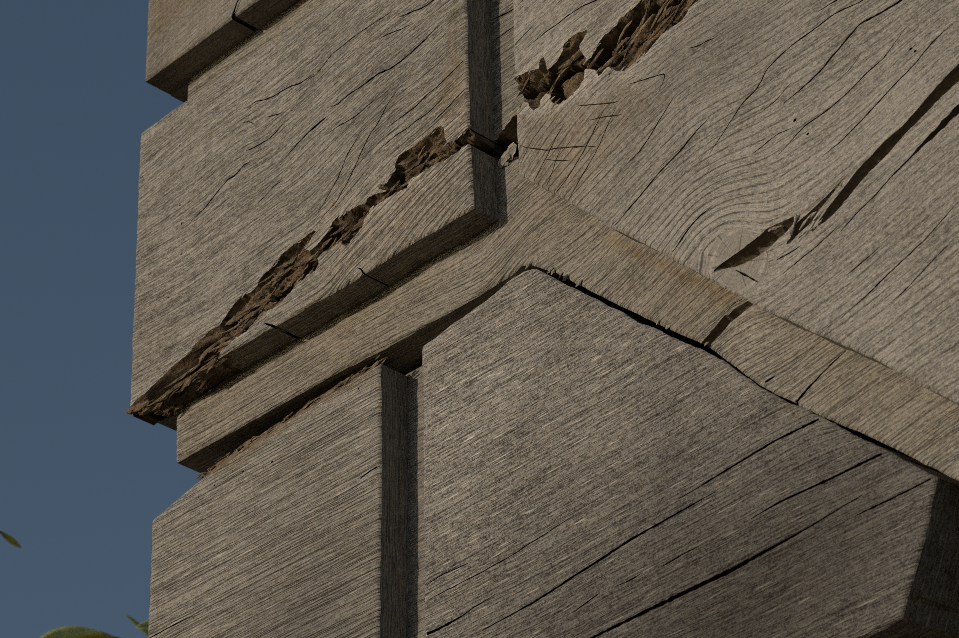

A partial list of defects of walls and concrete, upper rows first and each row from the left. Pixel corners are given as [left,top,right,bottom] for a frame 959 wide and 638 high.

peeling [368,125,472,212]
peeling [498,142,517,169]
peeling [549,0,700,110]
crack [615,0,905,225]
crack [702,64,959,348]
crack [825,25,951,154]
peeling [126,212,363,417]
crack [427,351,846,634]
crack [590,478,931,638]
crack [751,452,882,519]